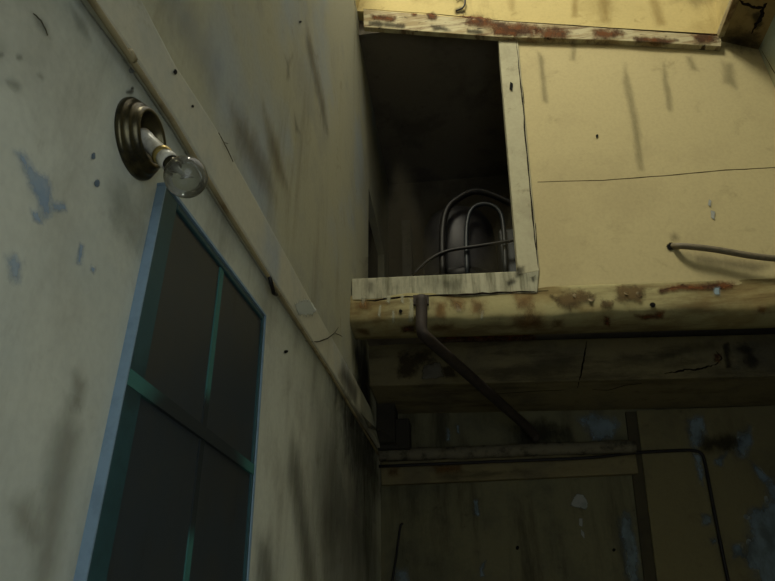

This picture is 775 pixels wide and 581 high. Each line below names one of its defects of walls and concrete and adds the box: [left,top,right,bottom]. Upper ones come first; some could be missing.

rust [462,15,569,40]
rust [593,28,678,46]
crack [739,0,767,34]
crack [579,167,775,181]
leakage [324,394,378,581]